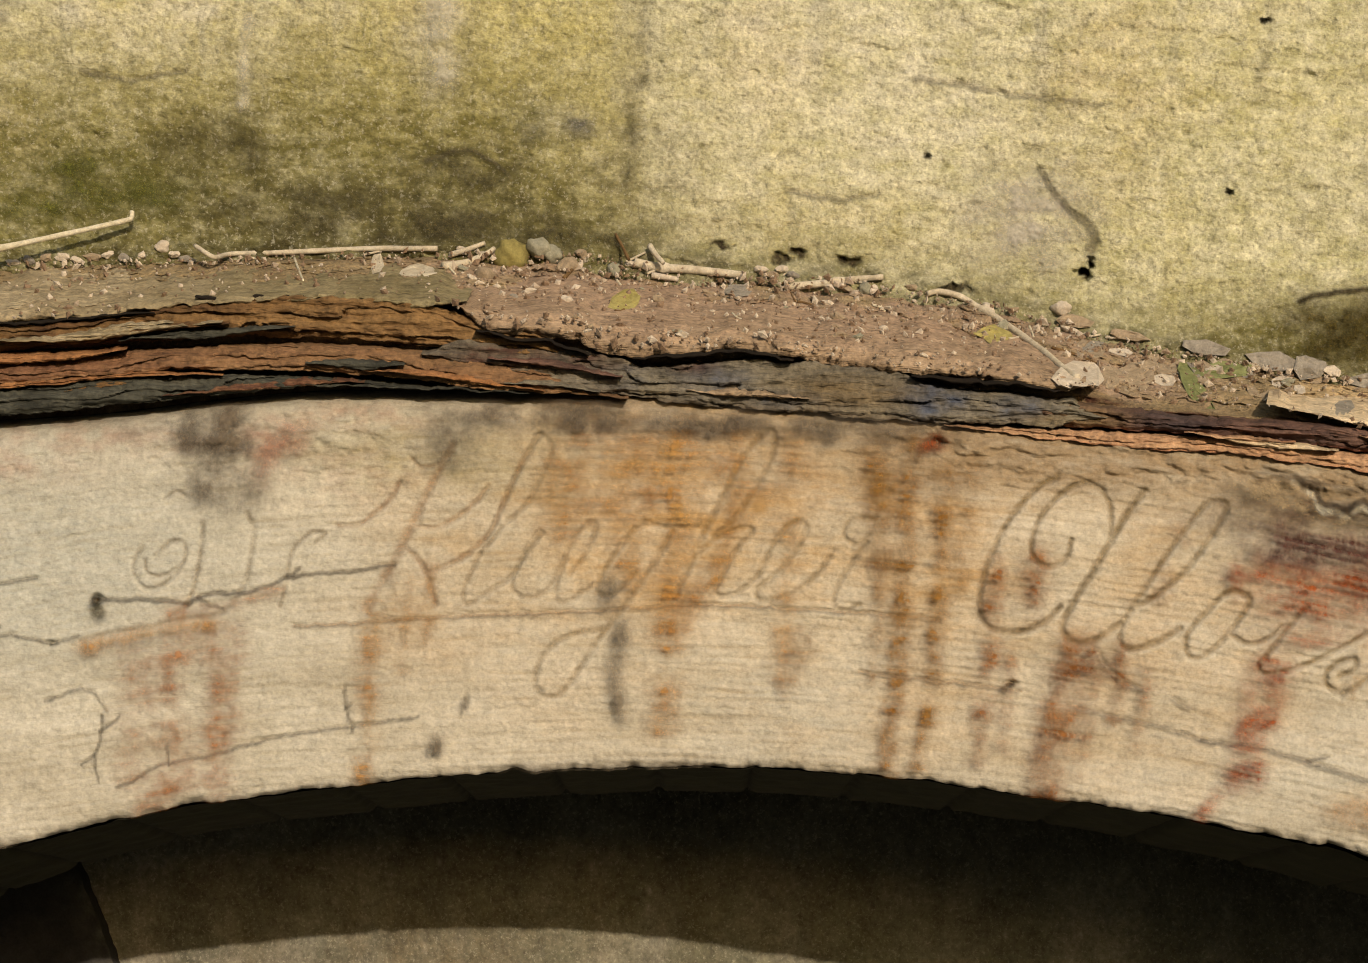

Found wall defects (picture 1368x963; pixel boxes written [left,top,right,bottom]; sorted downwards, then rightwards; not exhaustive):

damp [409,210,575,241]
peeling [0,263,1368,525]
corrosion [910,436,943,449]
corrosion [1232,566,1368,617]
corrosion [881,589,911,768]
corrosion [918,706,934,745]
corrosion [1230,708,1277,782]